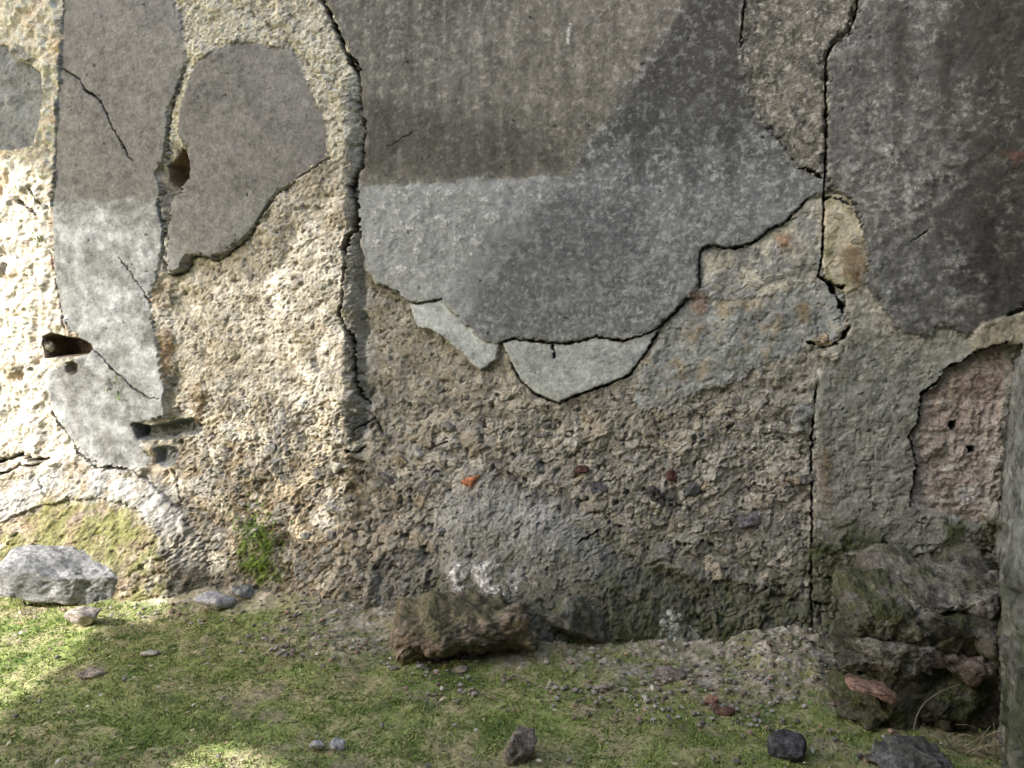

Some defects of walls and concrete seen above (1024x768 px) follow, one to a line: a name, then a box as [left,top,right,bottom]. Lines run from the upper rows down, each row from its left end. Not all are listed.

spalling [0,0,81,473]
crack [324,0,363,109]
crack [346,346,384,453]
spalling [135,0,1023,639]
crack [807,489,815,628]
crack [798,0,859,348]